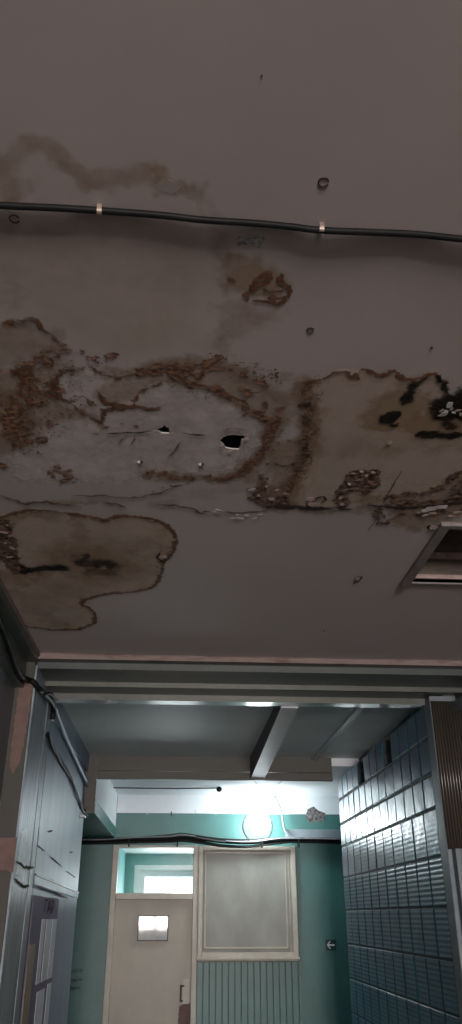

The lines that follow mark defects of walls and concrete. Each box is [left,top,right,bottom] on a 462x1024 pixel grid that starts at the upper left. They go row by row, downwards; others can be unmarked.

peeling [0,348,324,510]
water stain [289,368,462,507]
peeling [332,469,462,530]
water stain [0,509,178,631]
spalling [306,806,326,823]